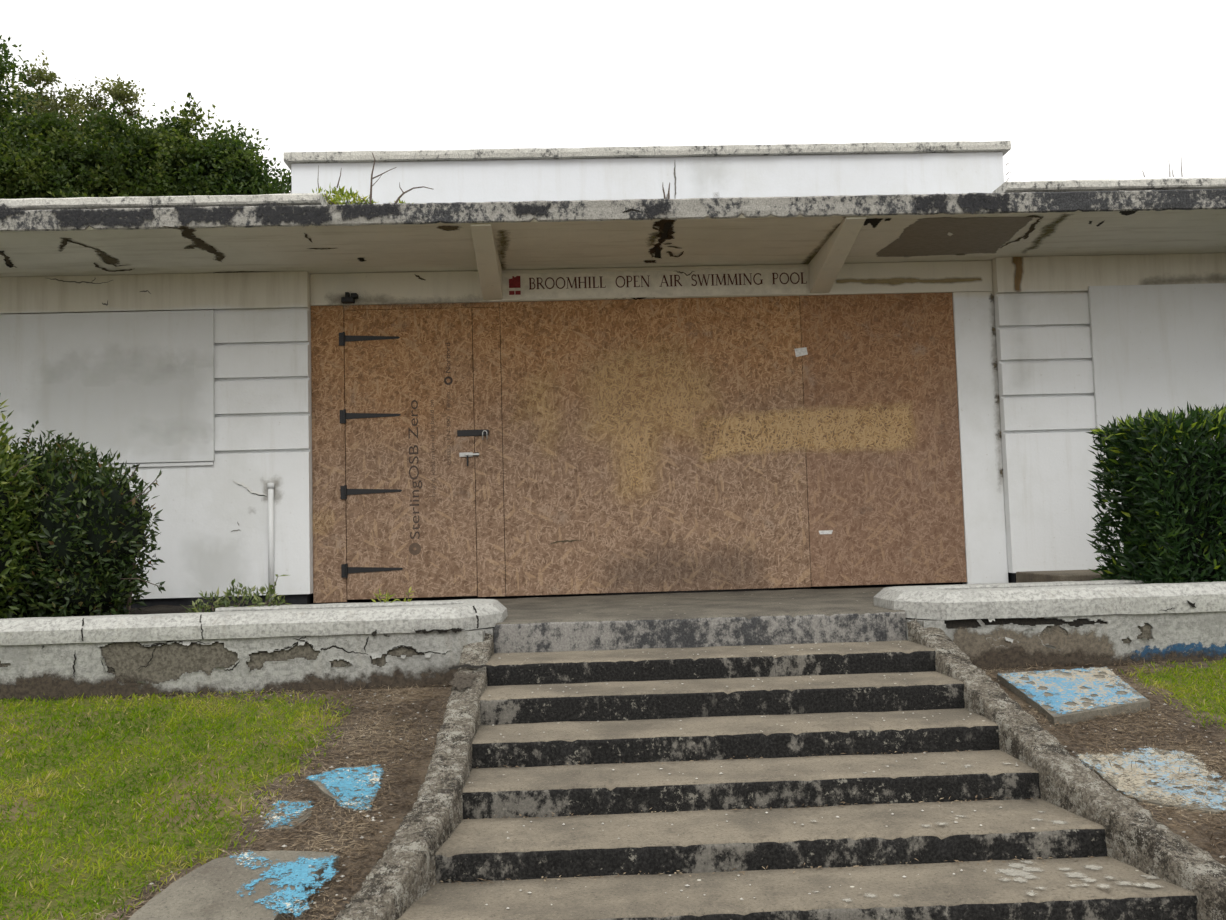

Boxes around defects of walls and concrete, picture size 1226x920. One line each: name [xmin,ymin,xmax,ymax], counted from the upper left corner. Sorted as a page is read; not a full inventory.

peeling [876,217,1033,257]
peeling [100,640,448,684]
peeling [952,619,1153,662]